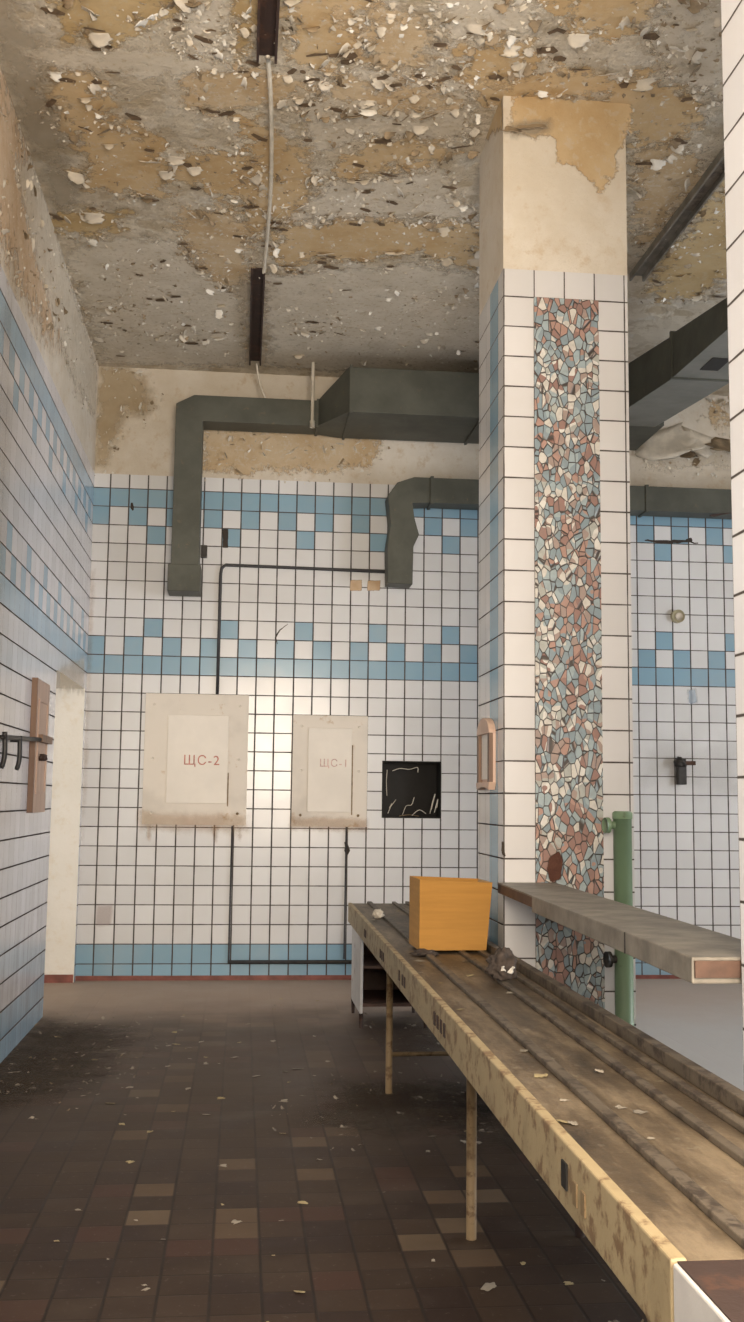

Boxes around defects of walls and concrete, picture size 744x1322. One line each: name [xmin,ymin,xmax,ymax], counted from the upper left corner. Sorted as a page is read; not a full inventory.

peeling [203,430,393,485]
peeling [0,0,731,479]